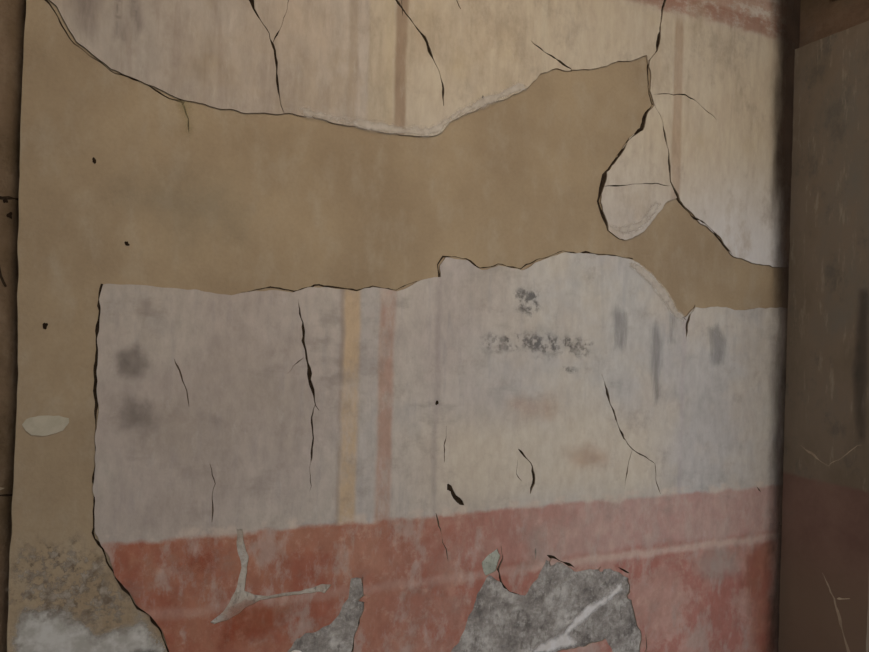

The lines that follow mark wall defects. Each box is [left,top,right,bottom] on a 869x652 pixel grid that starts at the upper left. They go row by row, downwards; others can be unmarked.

crack [249,0,289,98]
crack [396,0,433,59]
peeling [347,83,525,135]
crack [597,0,729,251]
crack [0,194,19,202]
crack [437,251,633,277]
crack [248,281,417,459]
crack [605,387,652,462]
damp [14,547,164,652]
spalling [211,529,330,624]
spalling [287,578,370,652]
spalling [451,549,641,652]